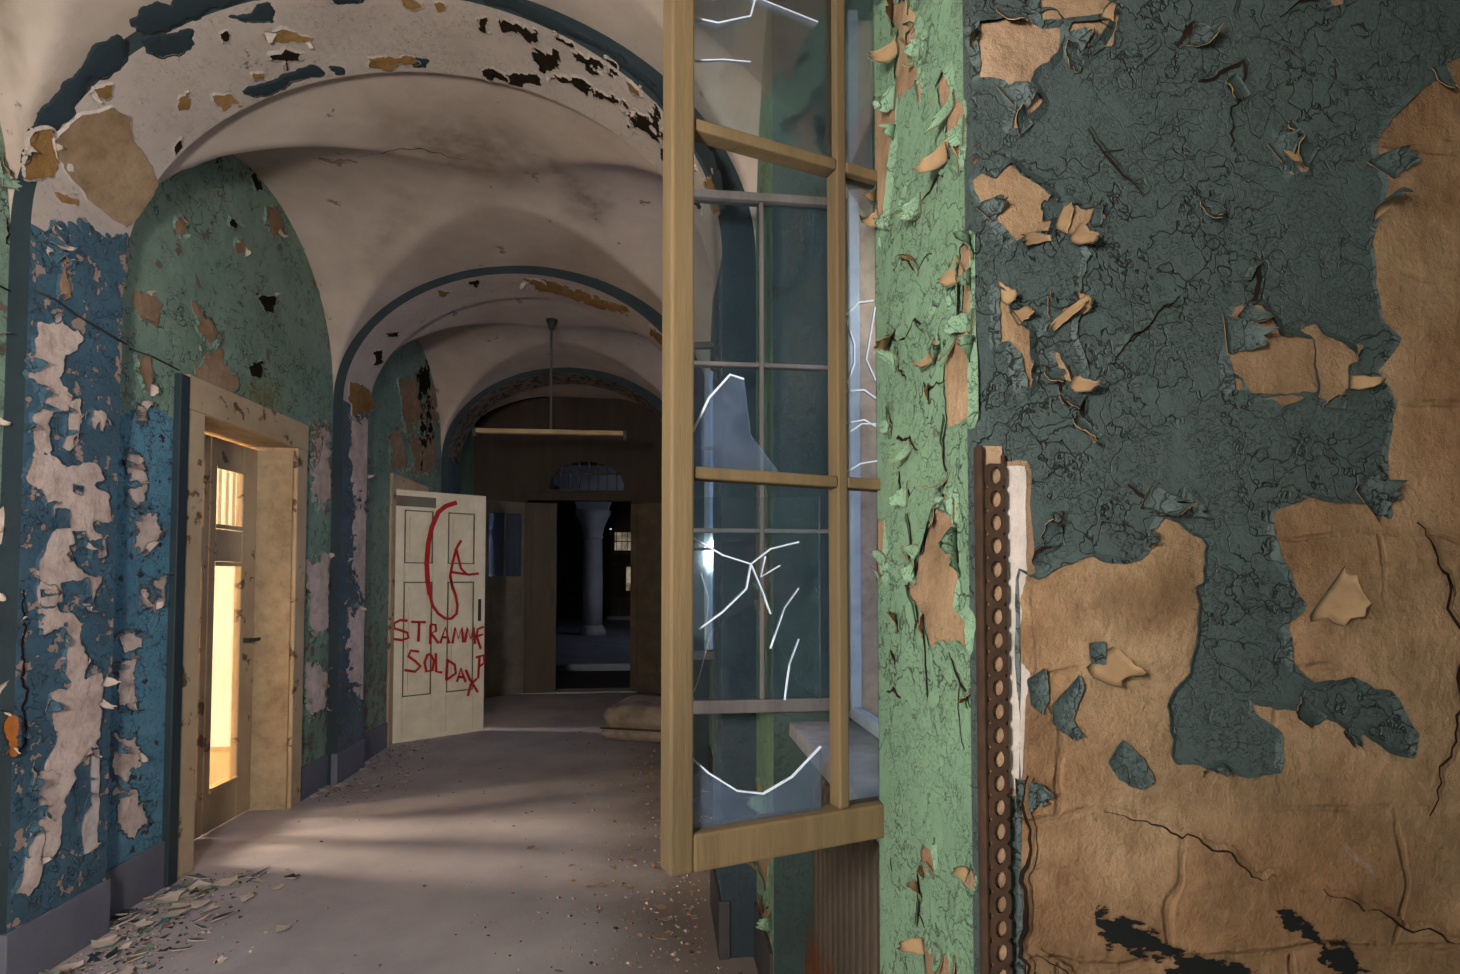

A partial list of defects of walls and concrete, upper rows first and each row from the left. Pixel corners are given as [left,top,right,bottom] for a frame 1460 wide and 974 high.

peeling [176,89,240,112]
peeling [249,25,314,82]
peeling [366,54,421,73]
peeling [475,15,663,162]
crack [4,218,12,245]
peeling [859,0,1122,431]
peeling [0,82,174,899]
spalling [908,484,976,655]
spalling [1005,56,1460,974]
crack [1417,518,1460,630]
crack [1429,665,1460,816]
peeling [896,930,961,974]